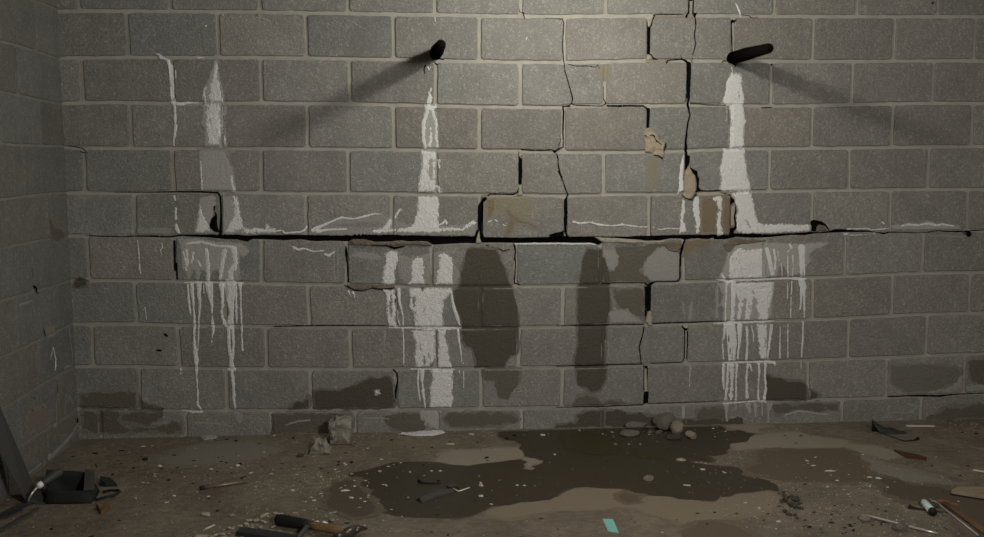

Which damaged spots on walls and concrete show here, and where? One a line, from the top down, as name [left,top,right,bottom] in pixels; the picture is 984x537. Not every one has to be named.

damp [118,53,839,520]
crack [90,0,982,408]
spalling [644,128,665,158]
spalling [723,238,766,252]